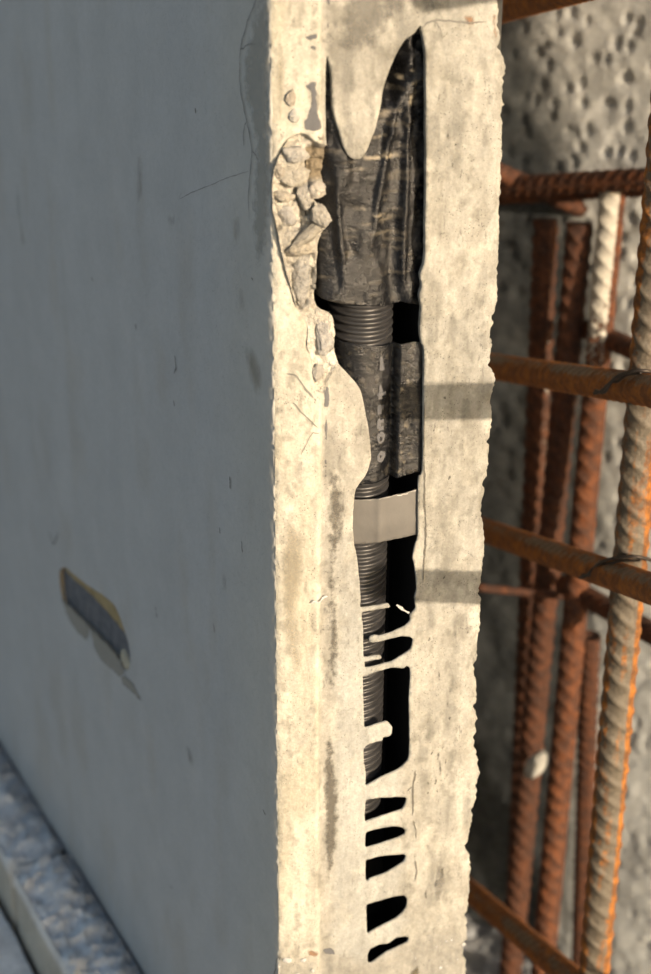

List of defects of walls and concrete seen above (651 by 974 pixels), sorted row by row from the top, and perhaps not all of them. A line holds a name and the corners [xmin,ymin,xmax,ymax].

crack [179,0,259,210]
spalling [270,89,338,393]
spalling [62,601,141,700]